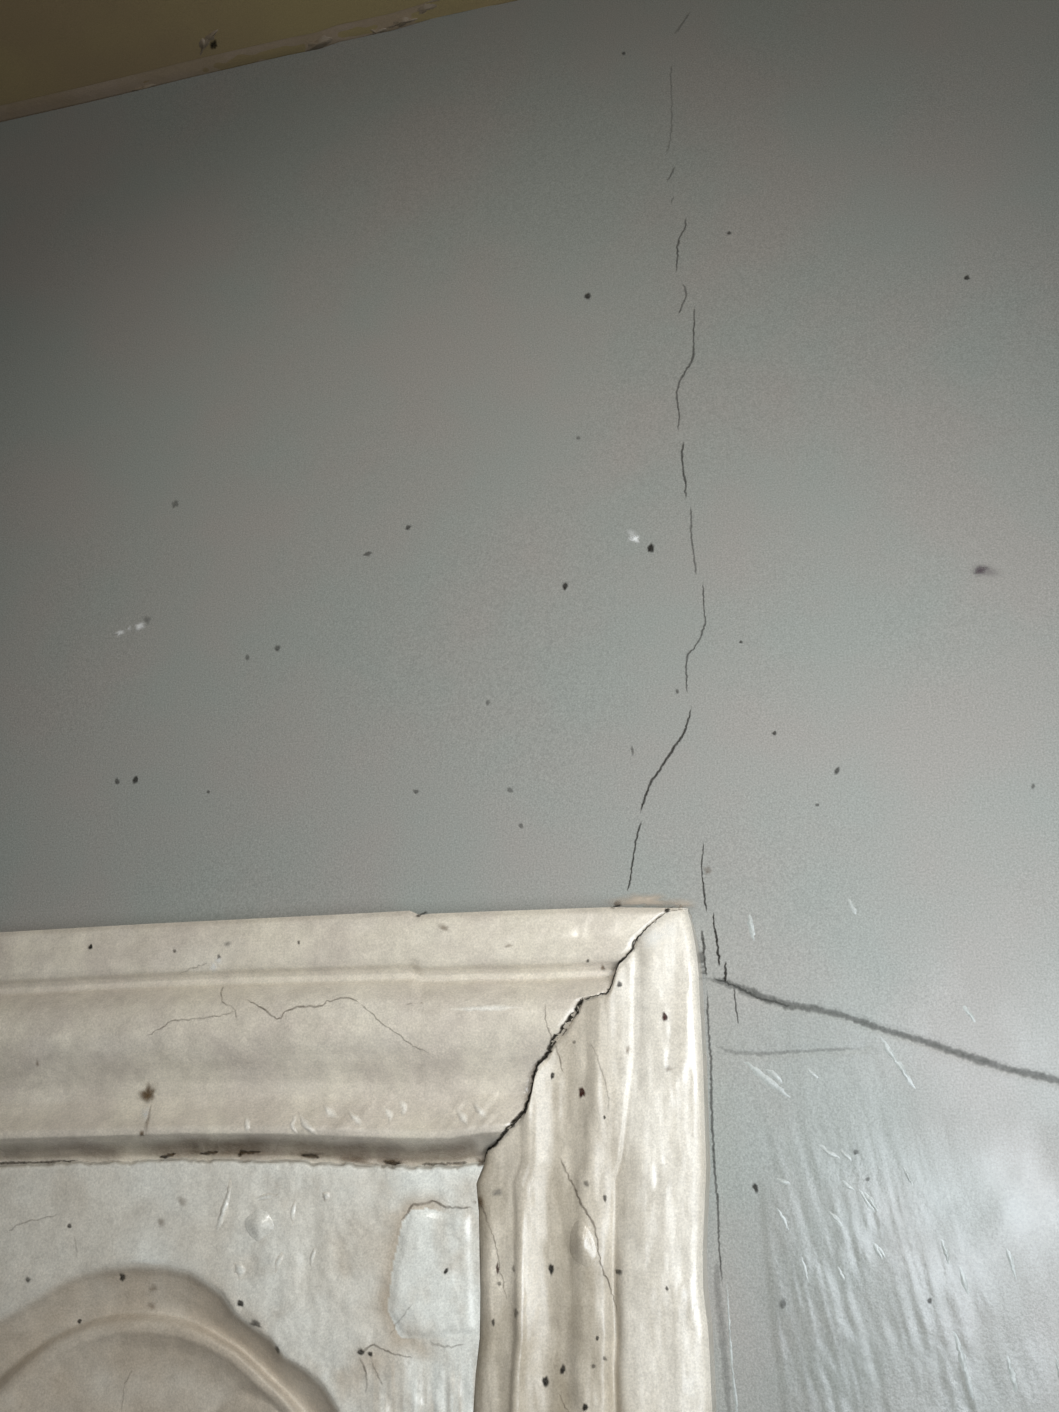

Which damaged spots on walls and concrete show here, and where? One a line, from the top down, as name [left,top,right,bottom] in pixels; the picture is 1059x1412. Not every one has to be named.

crack [628,592,705,888]
crack [435,914,664,1165]
crack [701,845,1045,1077]